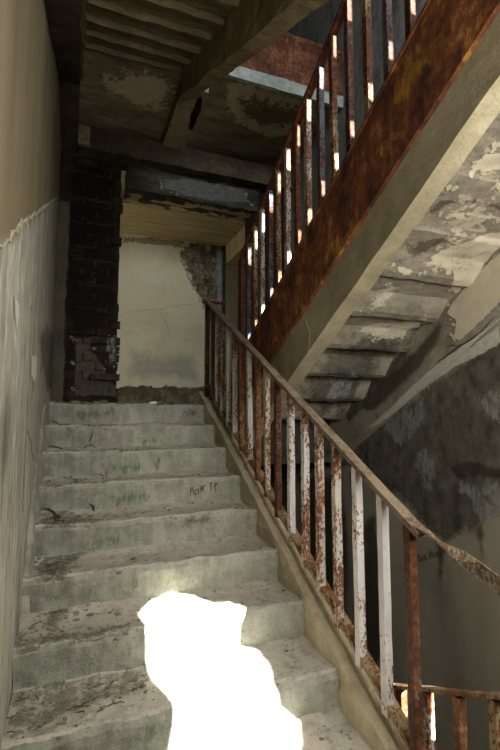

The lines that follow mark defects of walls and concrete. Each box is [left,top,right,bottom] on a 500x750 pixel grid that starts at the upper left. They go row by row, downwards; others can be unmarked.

corrosion [394,41,438,104]
peeling [159,177,254,206]
peeling [0,198,57,249]
spalling [120,235,222,330]
peeling [359,283,400,314]
peeling [359,311,431,343]
water stain [353,343,500,575]